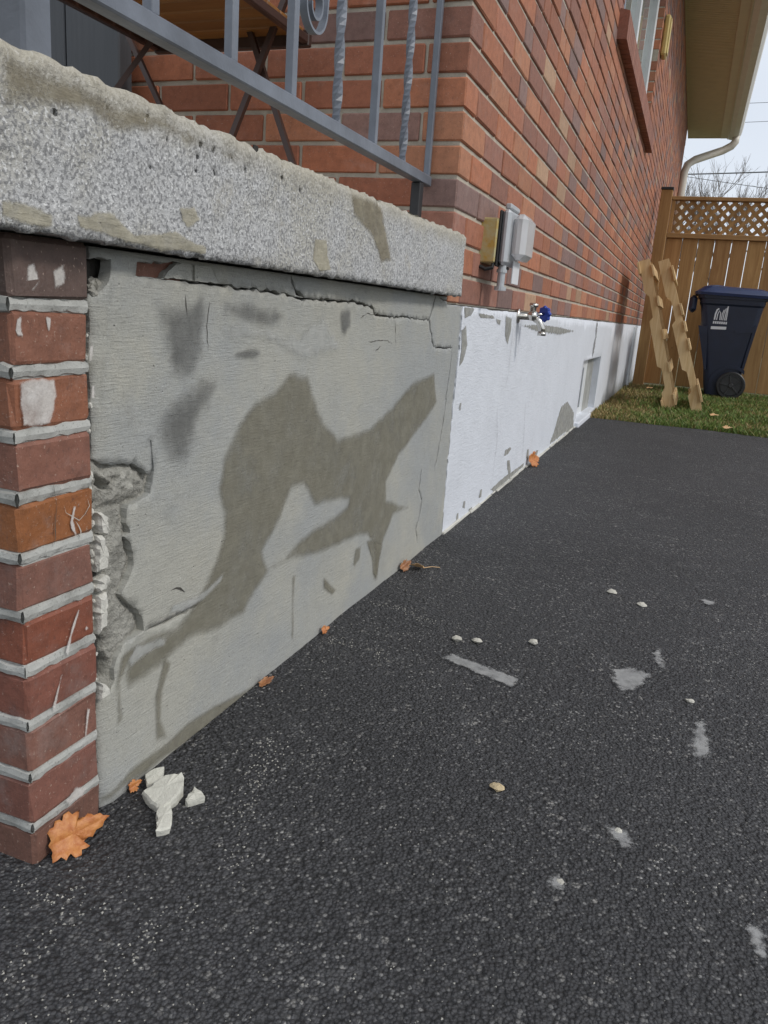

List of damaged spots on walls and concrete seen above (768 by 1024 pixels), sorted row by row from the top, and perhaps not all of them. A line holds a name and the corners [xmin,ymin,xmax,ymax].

damp [170,306,202,368]
crack [180,280,405,350]
damp [342,312,350,331]
peeling [460,307,501,365]
peeling [550,402,574,443]
peeling [456,448,538,520]
spalling [88,460,147,700]
damp [120,375,436,781]